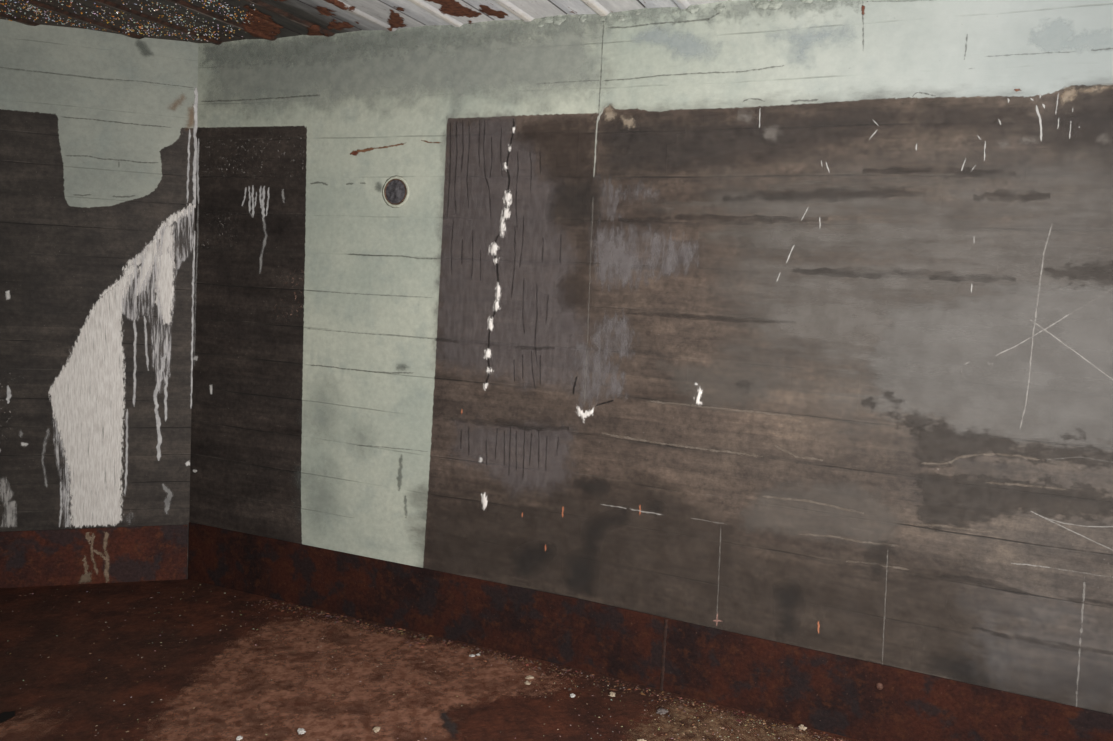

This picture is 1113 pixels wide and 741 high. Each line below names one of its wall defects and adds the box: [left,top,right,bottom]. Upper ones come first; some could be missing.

rust [241,5,283,40]
rust [306,0,359,37]
rust [387,6,406,31]
leakage [204,14,595,104]
rust [425,0,509,24]
leakage [1066,104,1113,153]
leakage [242,186,284,270]
leakage [591,109,895,289]
leakage [42,88,199,583]
leakage [731,174,1113,527]
rust [152,598,848,741]